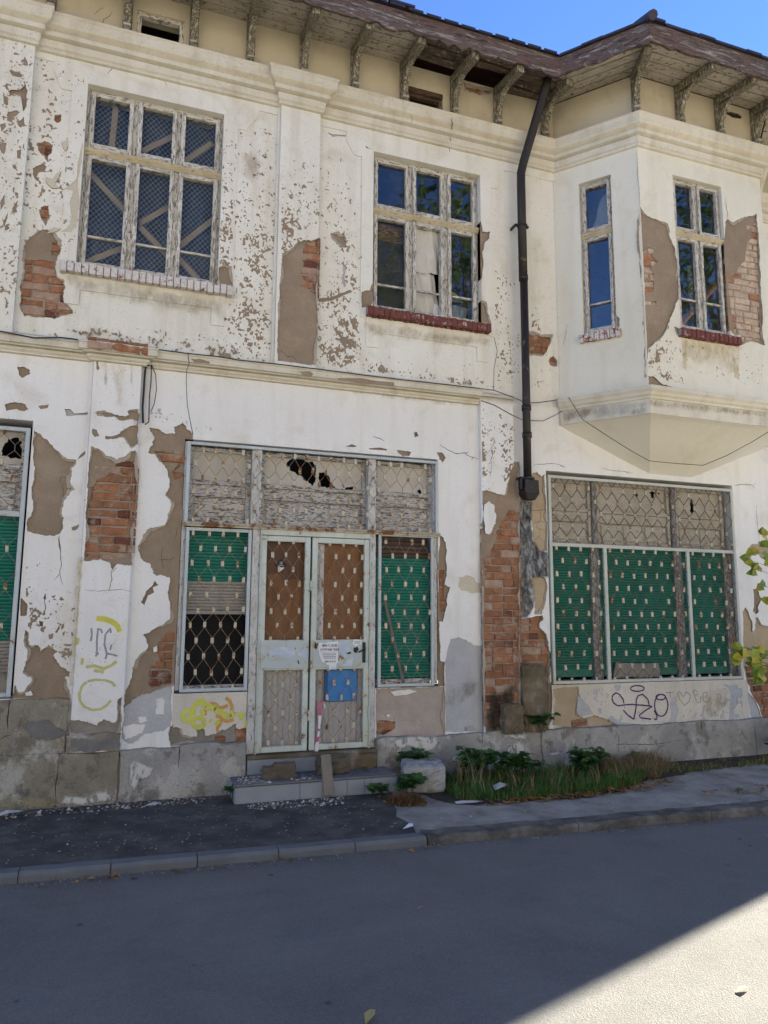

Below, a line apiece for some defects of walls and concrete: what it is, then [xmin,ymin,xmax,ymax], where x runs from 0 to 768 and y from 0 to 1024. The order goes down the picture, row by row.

flaking render [0,39,557,389]
flaking render [637,208,704,386]
flaking render [722,214,764,384]
flaking render [10,563,75,700]
flaking render [25,409,246,753]
flaking render [376,409,660,770]
flaking render [682,589,768,721]